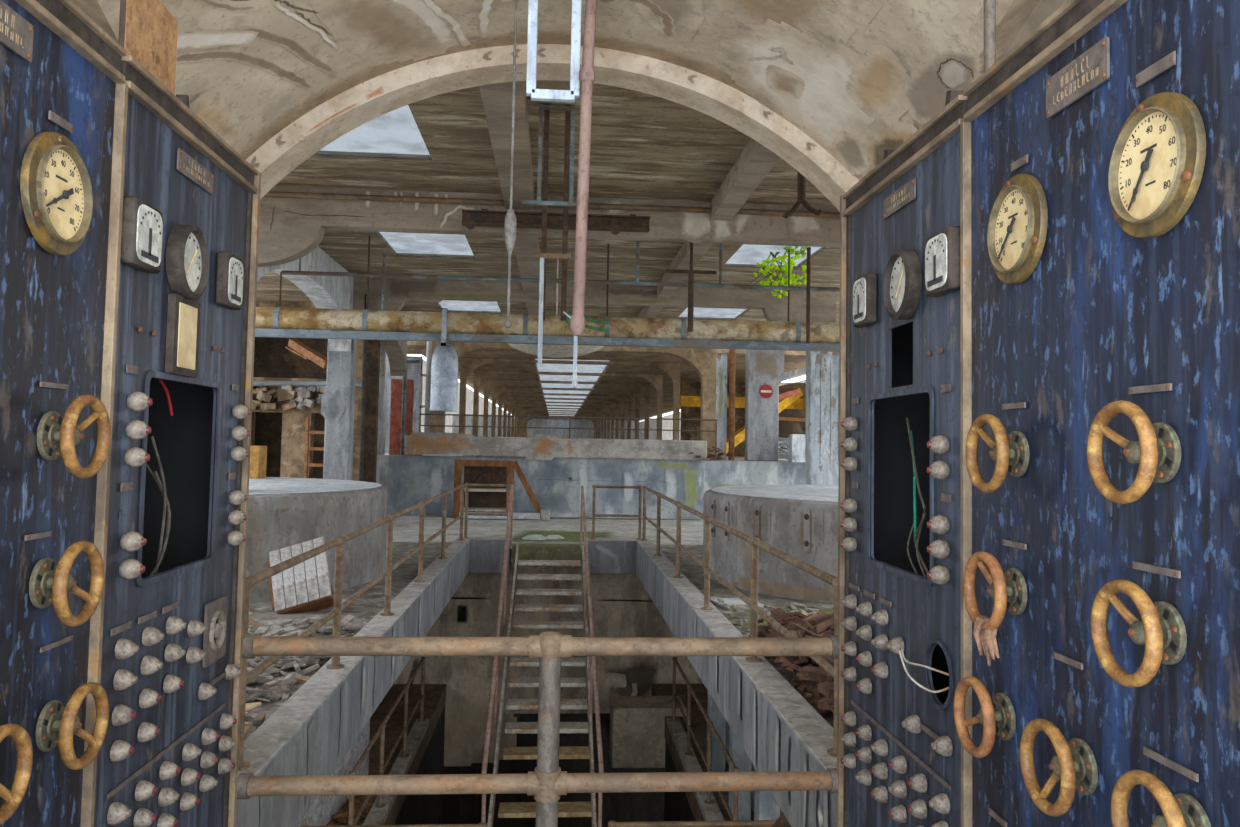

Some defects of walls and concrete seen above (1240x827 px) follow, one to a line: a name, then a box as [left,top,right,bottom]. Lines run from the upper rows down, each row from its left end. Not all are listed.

crack [197,0,340,50]
rust [405,432,478,457]
rust [526,434,574,460]